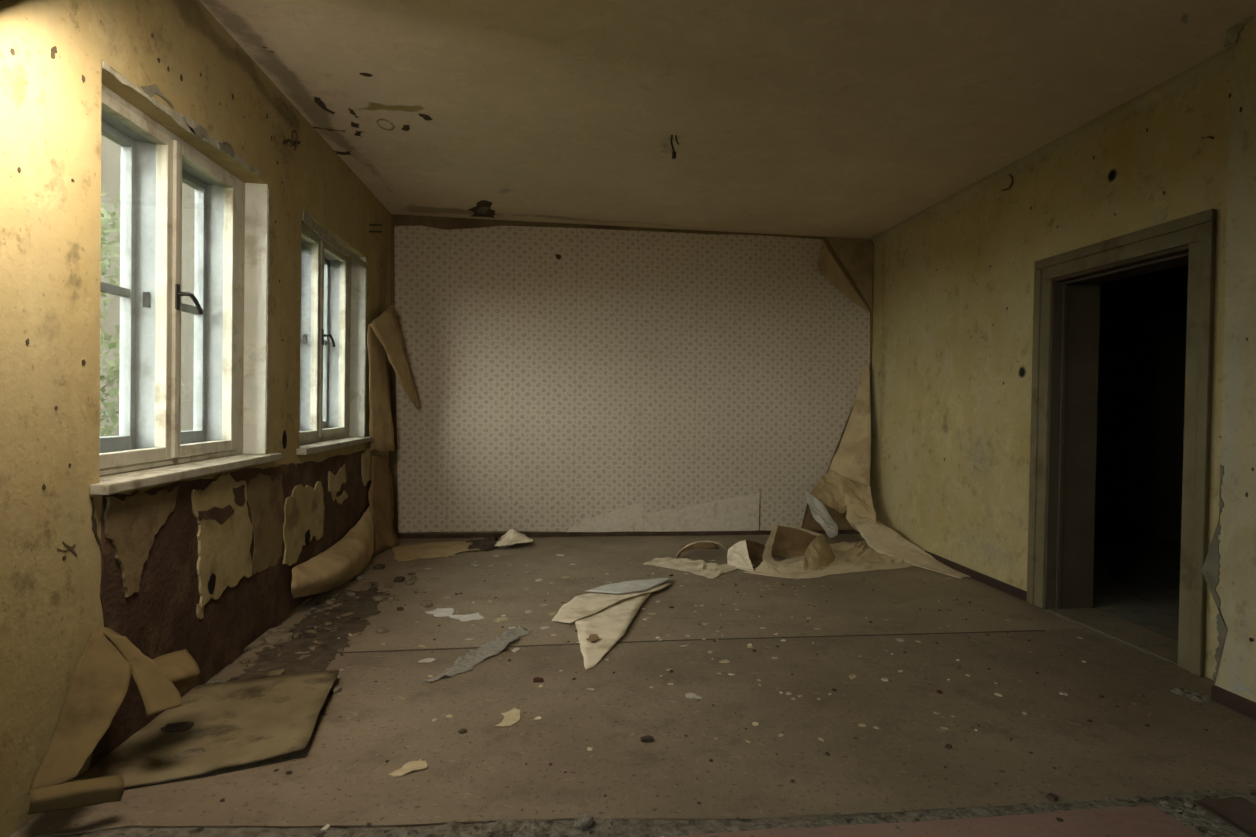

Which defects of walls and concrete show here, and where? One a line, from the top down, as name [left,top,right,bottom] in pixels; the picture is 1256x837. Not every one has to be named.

peeling [100,260,372,697]
flaking render [803,499,855,530]
flaking render [1201,456,1228,684]
peeling [89,673,165,769]